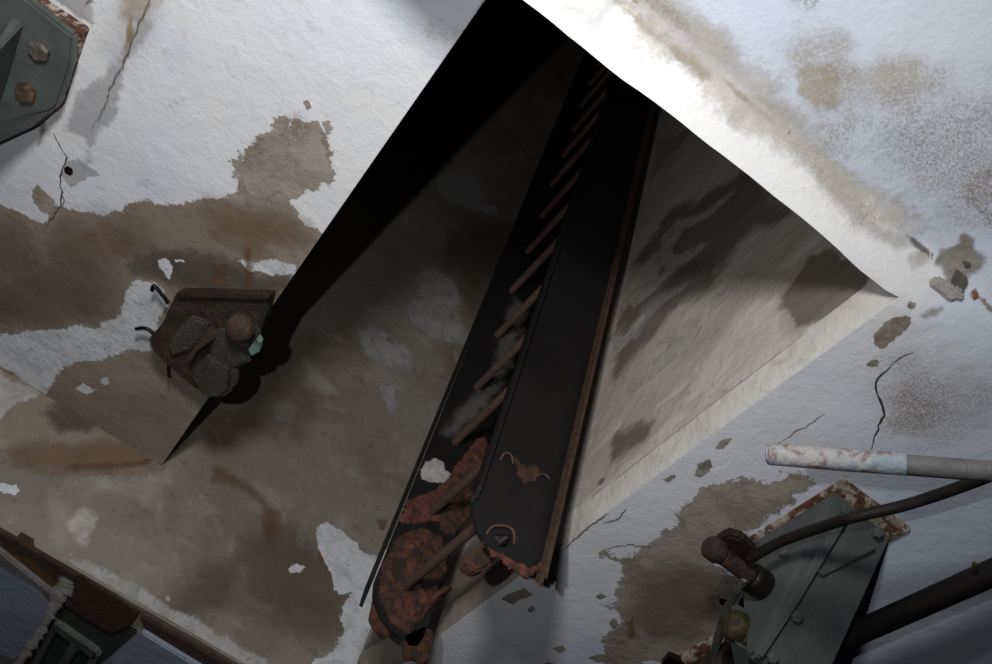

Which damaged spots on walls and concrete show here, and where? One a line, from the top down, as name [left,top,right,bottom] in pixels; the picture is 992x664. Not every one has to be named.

crack [95,0,150,121]
crack [47,133,68,226]
flaking render [0,116,337,481]
water stain [357,328,412,372]
water stain [612,162,790,393]
water stain [783,250,869,326]
peeling [874,301,916,348]
spalling [929,234,984,300]
crack [871,352,914,449]
water stain [612,422,651,460]
peeling [0,483,20,496]
peeling [289,563,305,573]